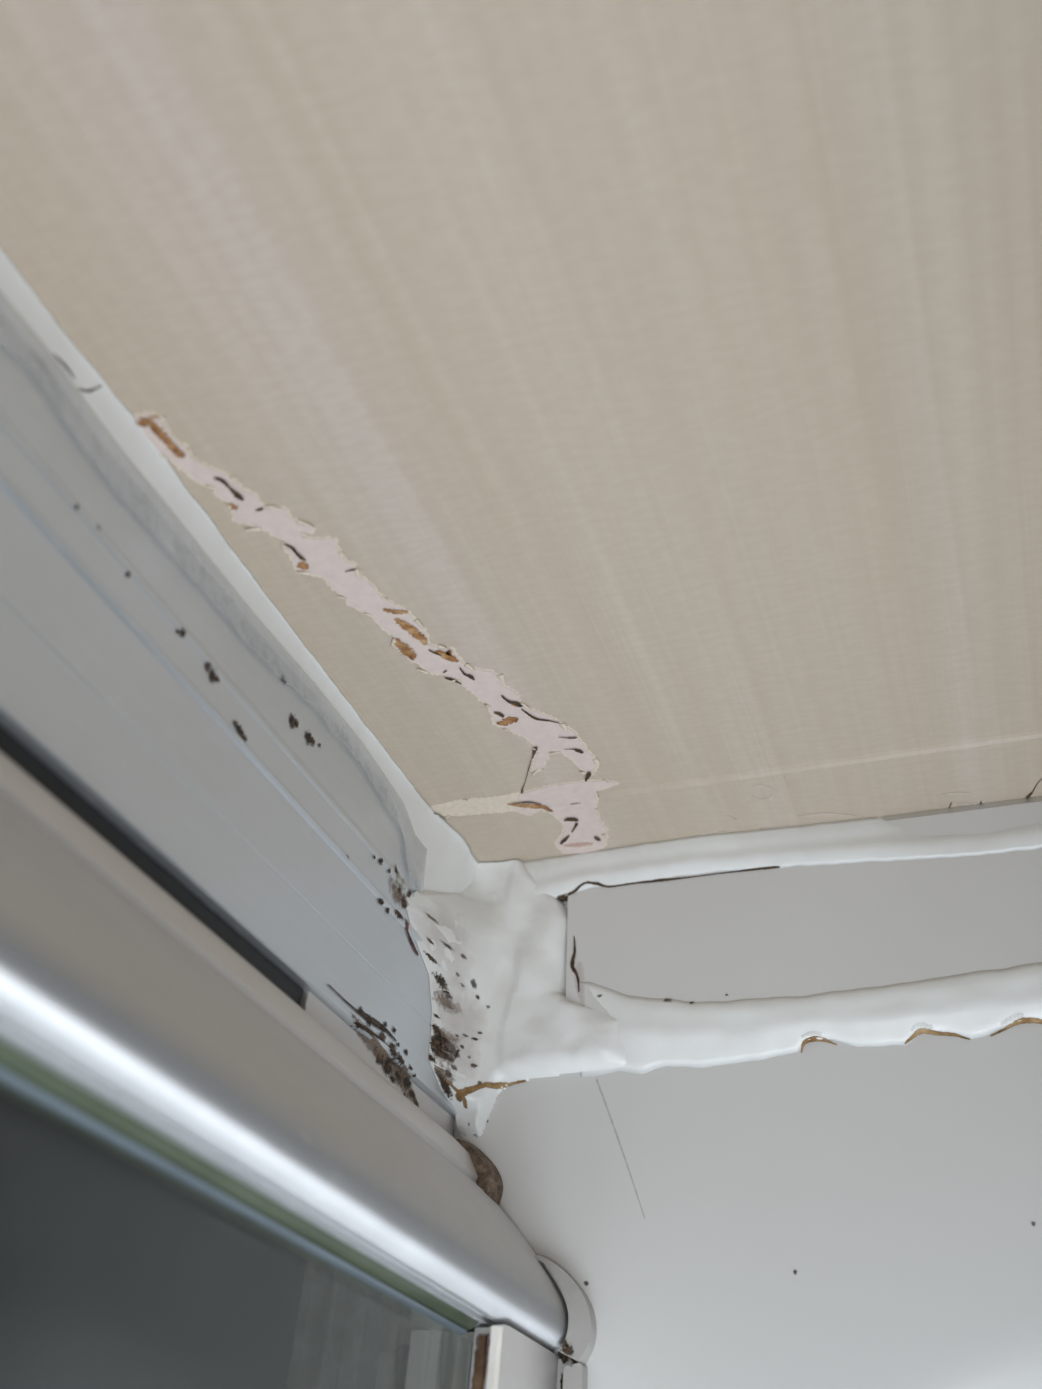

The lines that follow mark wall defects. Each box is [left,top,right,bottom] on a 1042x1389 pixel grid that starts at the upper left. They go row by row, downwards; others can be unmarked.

peeling [134,411,621,855]
crack [557,866,780,902]
water stain [374,855,490,1102]
crack [570,936,580,992]
water stain [328,984,419,1108]